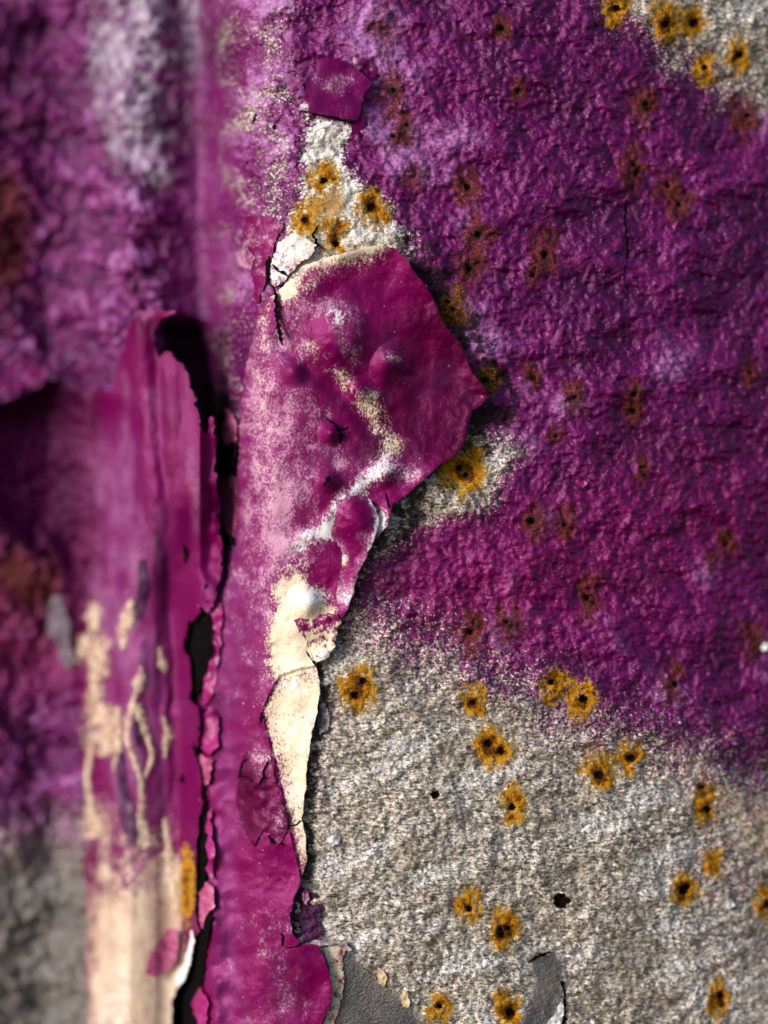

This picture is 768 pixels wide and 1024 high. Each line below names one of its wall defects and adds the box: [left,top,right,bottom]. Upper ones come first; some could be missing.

corrosion [646,0,761,147]
corrosion [288,158,392,257]
crack [265,256,288,345]
peeling [0,215,489,1024]
corrosion [334,662,380,717]
crack [237,758,269,786]
corrosion [459,681,529,829]
corrosion [576,738,649,794]
crack [268,820,301,846]
corrosion [178,842,196,929]
corrosion [452,885,523,956]
corrosion [553,893,571,908]